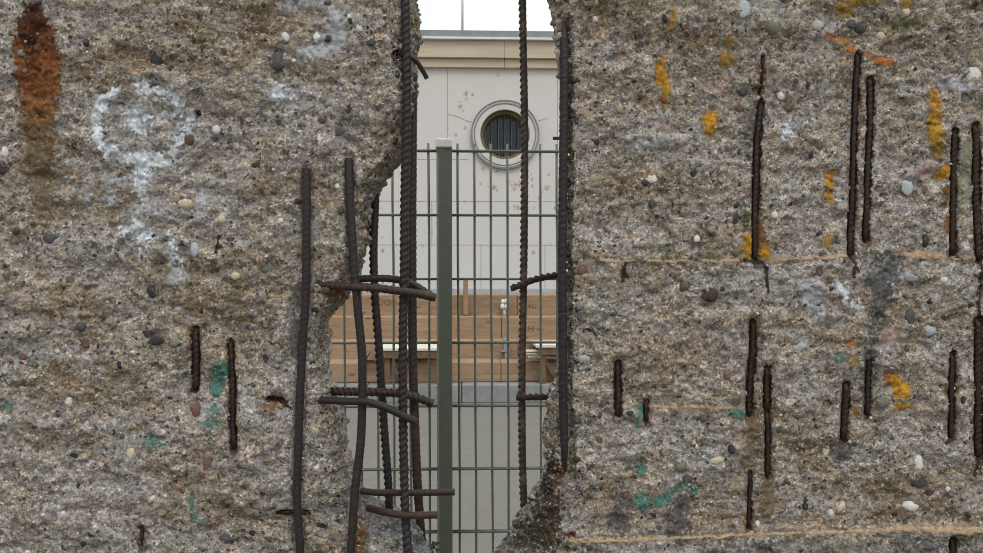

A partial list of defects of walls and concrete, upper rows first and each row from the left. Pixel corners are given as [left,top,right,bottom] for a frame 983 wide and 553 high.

rust [9,1,63,225]
spalling [256,0,455,553]
spalling [510,0,569,508]
rust [741,363,777,528]